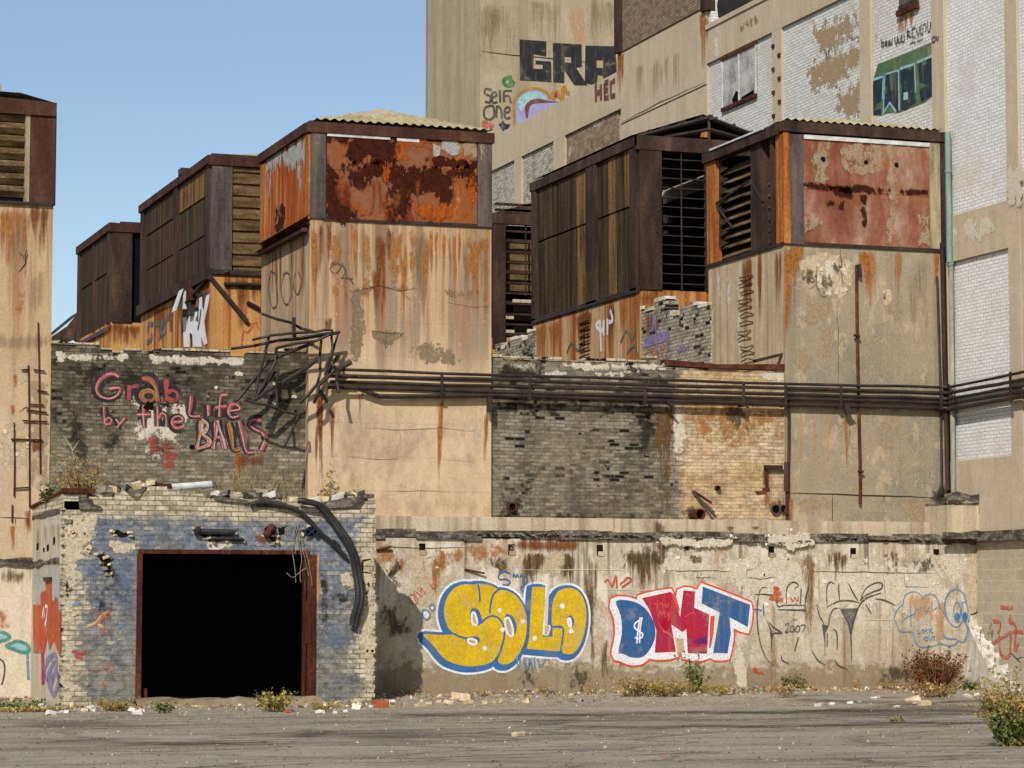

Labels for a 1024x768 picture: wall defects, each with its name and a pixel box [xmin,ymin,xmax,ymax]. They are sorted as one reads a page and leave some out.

peeling [806,10,860,120]
corrosion [0,207,48,253]
corrosion [272,133,488,304]
corrosion [775,135,939,328]
corrosion [743,254,762,305]
peeling [797,251,853,299]
spalling [349,285,415,362]
leakage [523,554,545,580]
leakage [563,554,574,577]
leakage [623,544,665,584]
spalling [33,510,140,705]
leakage [586,562,607,669]